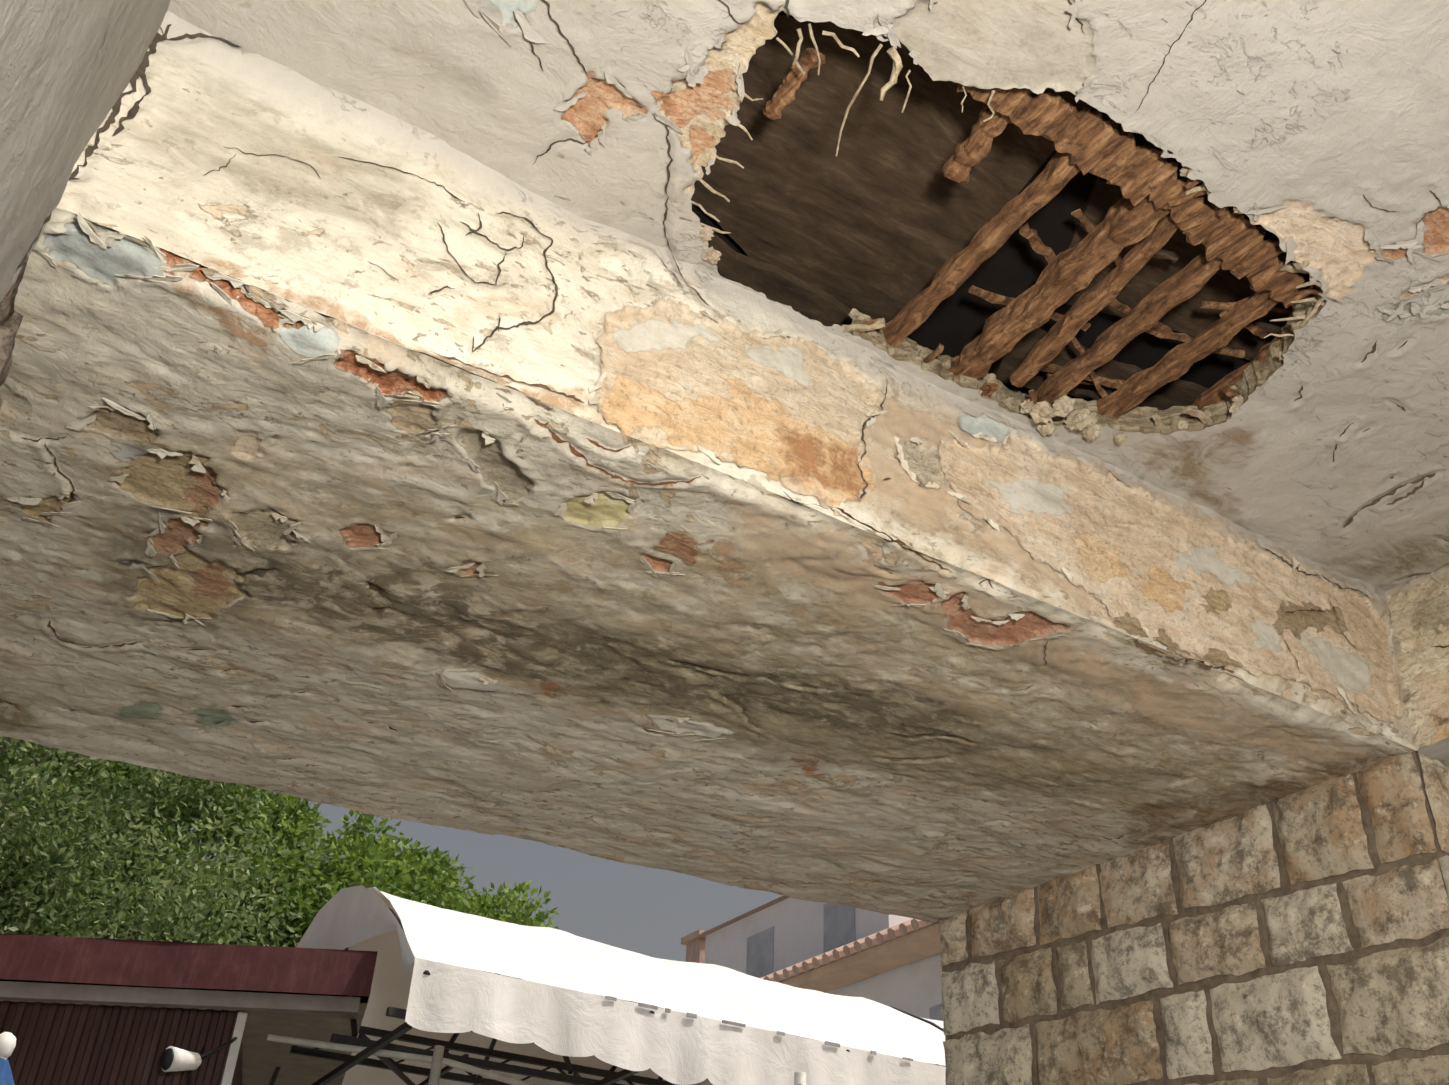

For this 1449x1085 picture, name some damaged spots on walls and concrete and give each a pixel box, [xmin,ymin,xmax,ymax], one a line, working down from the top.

crack [69,24,242,179]
spalling [554,2,783,194]
spalling [66,398,310,626]
peeling [42,212,535,506]
crack [203,146,701,485]
spalling [589,300,889,516]
spalling [874,410,1449,754]
crack [1264,548,1421,598]
spalling [1246,200,1449,325]